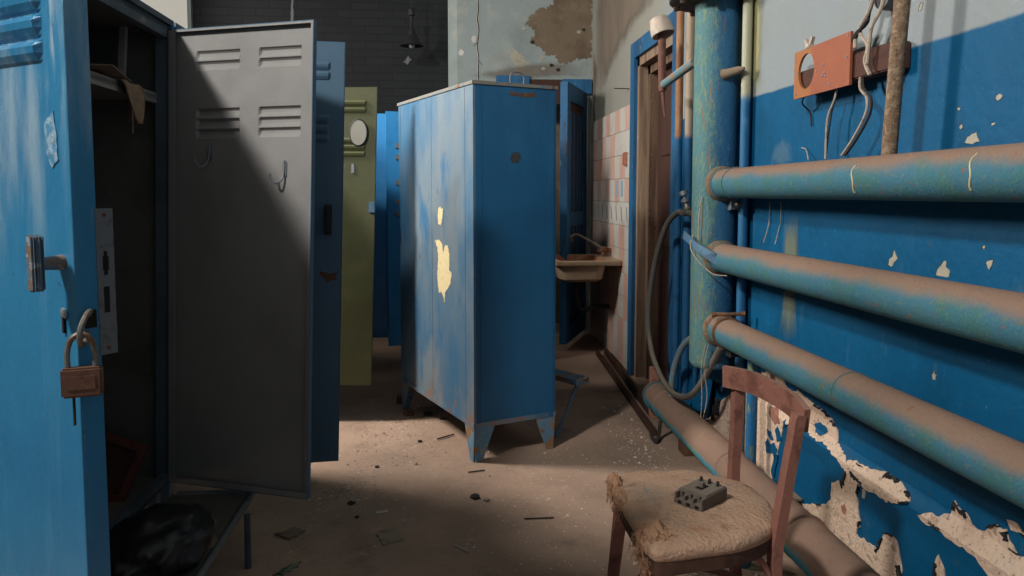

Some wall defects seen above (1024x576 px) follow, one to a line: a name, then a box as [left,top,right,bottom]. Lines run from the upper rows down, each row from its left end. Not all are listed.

peeling [522,0,593,72]
peeling [959,124,980,144]
peeling [935,260,950,277]
peeling [743,392,790,479]
peeling [758,371,911,576]
peeling [918,500,1024,576]